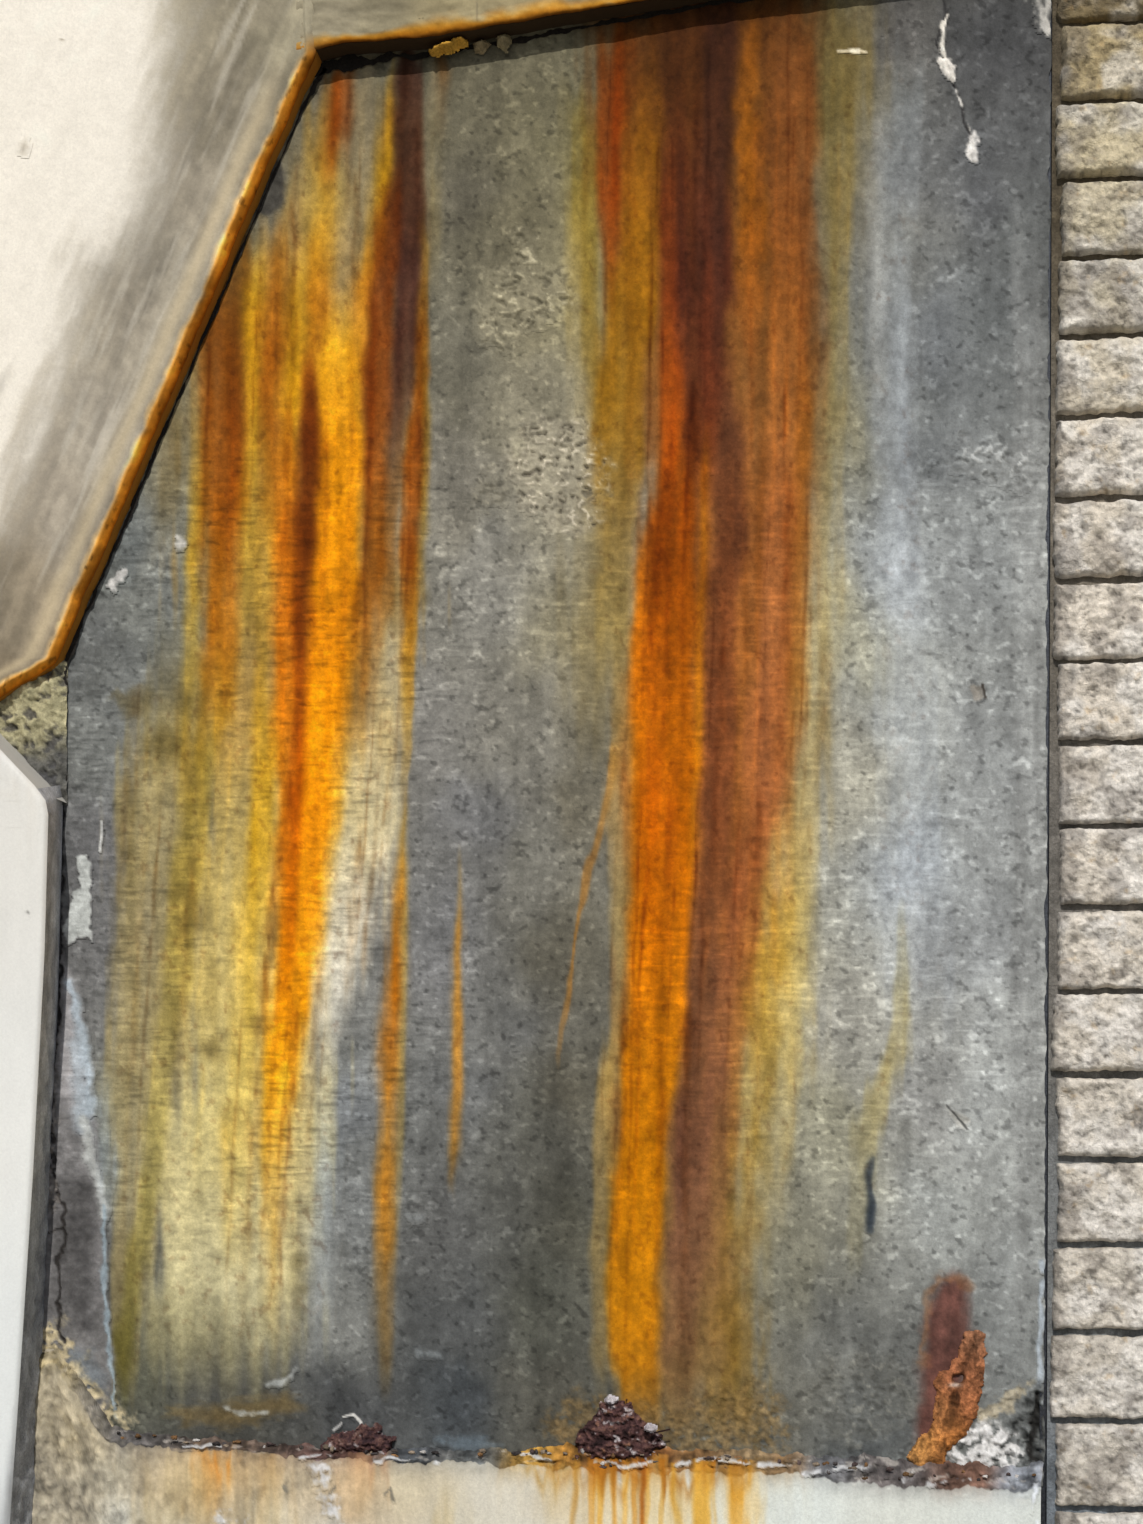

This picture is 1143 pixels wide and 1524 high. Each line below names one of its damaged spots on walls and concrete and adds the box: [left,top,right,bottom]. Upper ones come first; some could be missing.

crack [63,0,753,713]
crack [936,0,982,165]
rust [0,0,896,1524]
crack [48,775,68,1344]
rust [909,1266,978,1449]